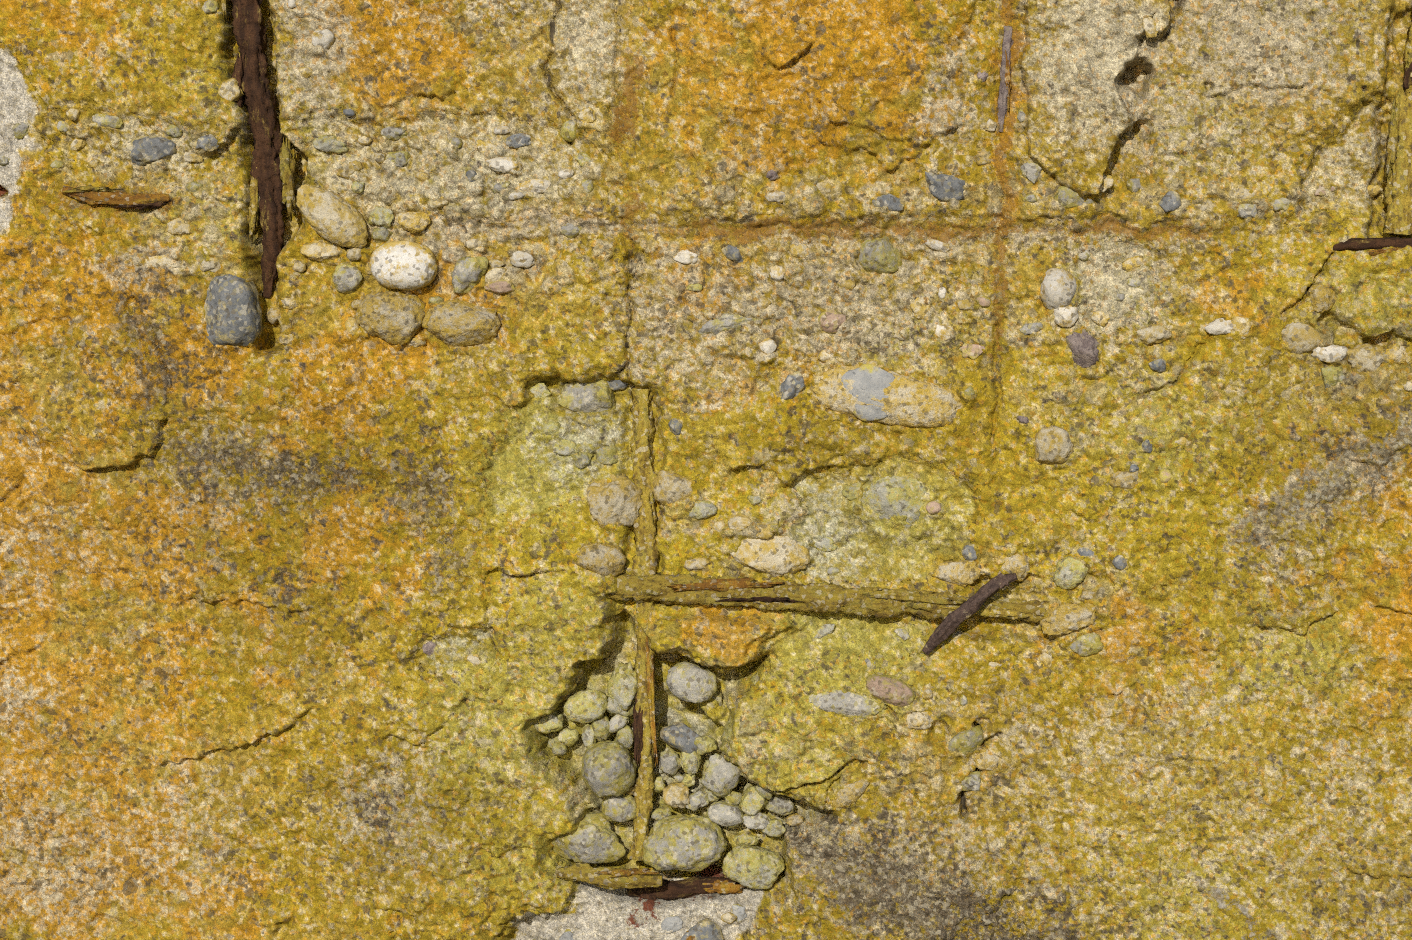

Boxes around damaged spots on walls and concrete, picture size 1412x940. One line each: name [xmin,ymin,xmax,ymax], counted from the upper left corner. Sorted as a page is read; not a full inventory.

rust [43,185,181,217]
spalling [0,41,228,231]
rust [221,0,296,298]
rust [620,0,1039,373]
spalling [478,372,635,525]
spalling [492,609,931,940]
rust [557,387,1051,929]